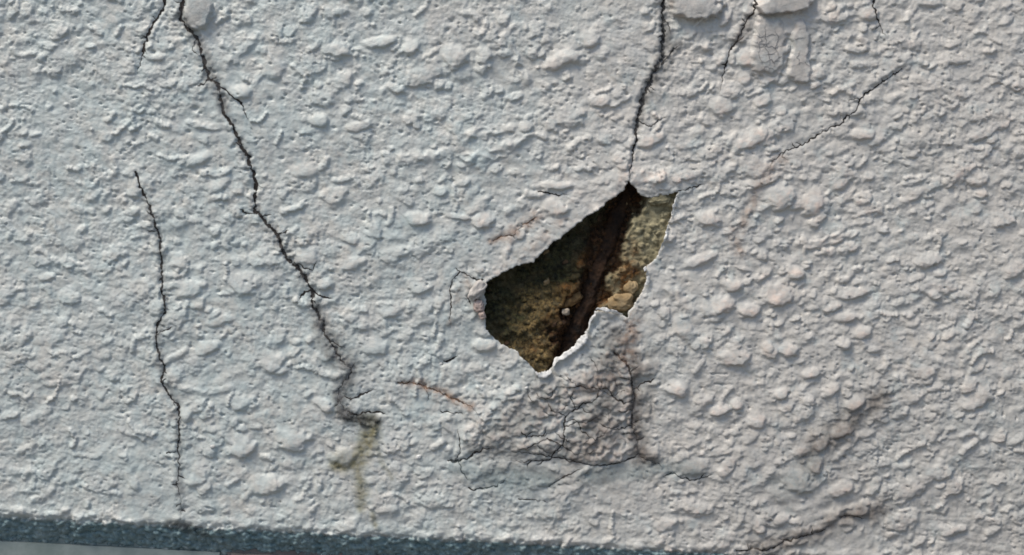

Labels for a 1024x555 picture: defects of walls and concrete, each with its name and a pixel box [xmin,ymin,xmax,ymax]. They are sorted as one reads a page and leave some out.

crack [719,0,758,92]
crack [760,68,902,179]
crack [134,0,712,517]
spalling [467,182,678,378]
water stain [332,410,380,470]